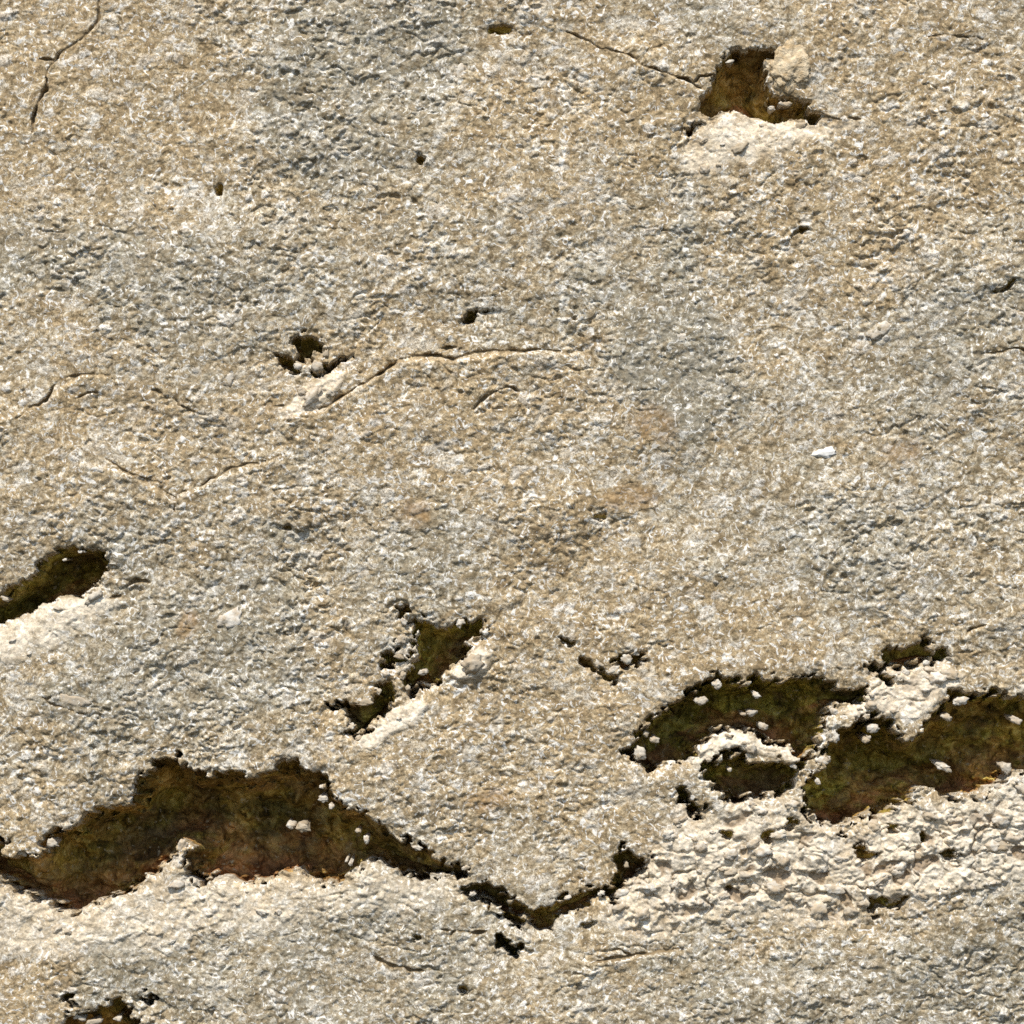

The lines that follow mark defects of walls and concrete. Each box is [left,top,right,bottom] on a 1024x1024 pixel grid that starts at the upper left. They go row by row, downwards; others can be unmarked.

crack [31,0,101,133]
crack [566,31,713,89]
spalling [681,48,865,177]
spalling [275,331,348,416]
crack [319,345,561,410]
spalling [0,545,112,666]
spalling [326,605,492,751]
spalling [579,636,1024,944]
spalling [0,752,470,960]